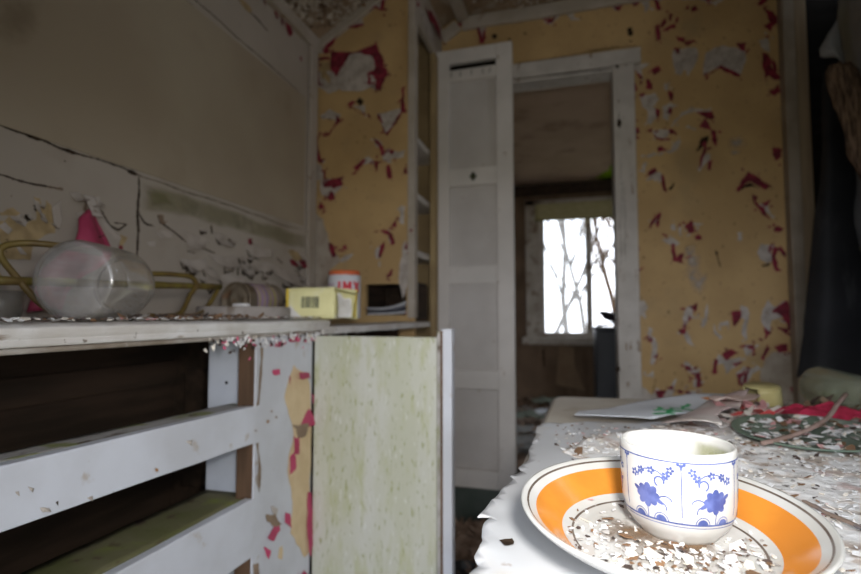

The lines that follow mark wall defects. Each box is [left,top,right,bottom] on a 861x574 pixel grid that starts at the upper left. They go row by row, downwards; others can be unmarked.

peeling [654,0,697,54]
peeling [762,52,781,96]
peeling [636,90,677,152]
peeling [0,192,127,260]
crack [0,125,299,258]
peeling [197,86,408,303]
peeling [649,213,691,264]
peeling [678,220,702,240]
peeling [736,168,784,232]
peeling [769,243,786,271]
peeling [655,364,703,398]
peeling [203,332,364,574]